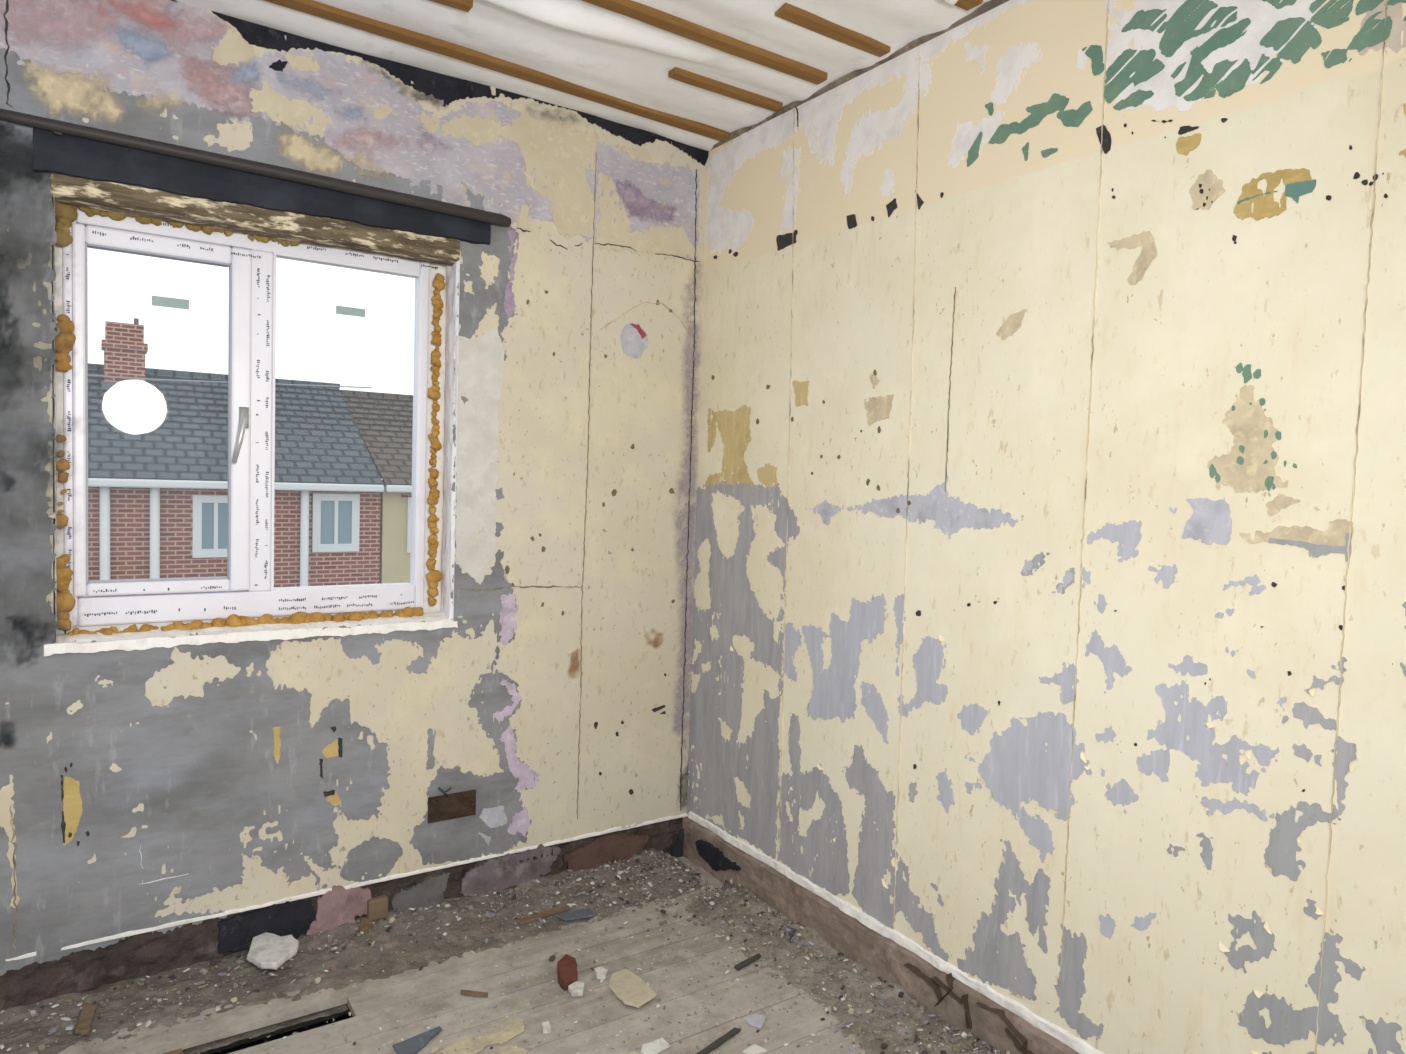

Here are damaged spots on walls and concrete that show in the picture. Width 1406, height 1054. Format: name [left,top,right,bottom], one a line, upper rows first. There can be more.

crack [3,0,13,108]
flaking render [1070,0,1323,154]
flaking render [1359,0,1406,55]
peeling [1353,172,1388,198]
peeling [0,0,1042,976]
crack [1314,0,1388,1054]
peeling [686,475,1366,1054]
flaking render [640,1037,671,1054]
peeling [1359,1016,1405,1054]